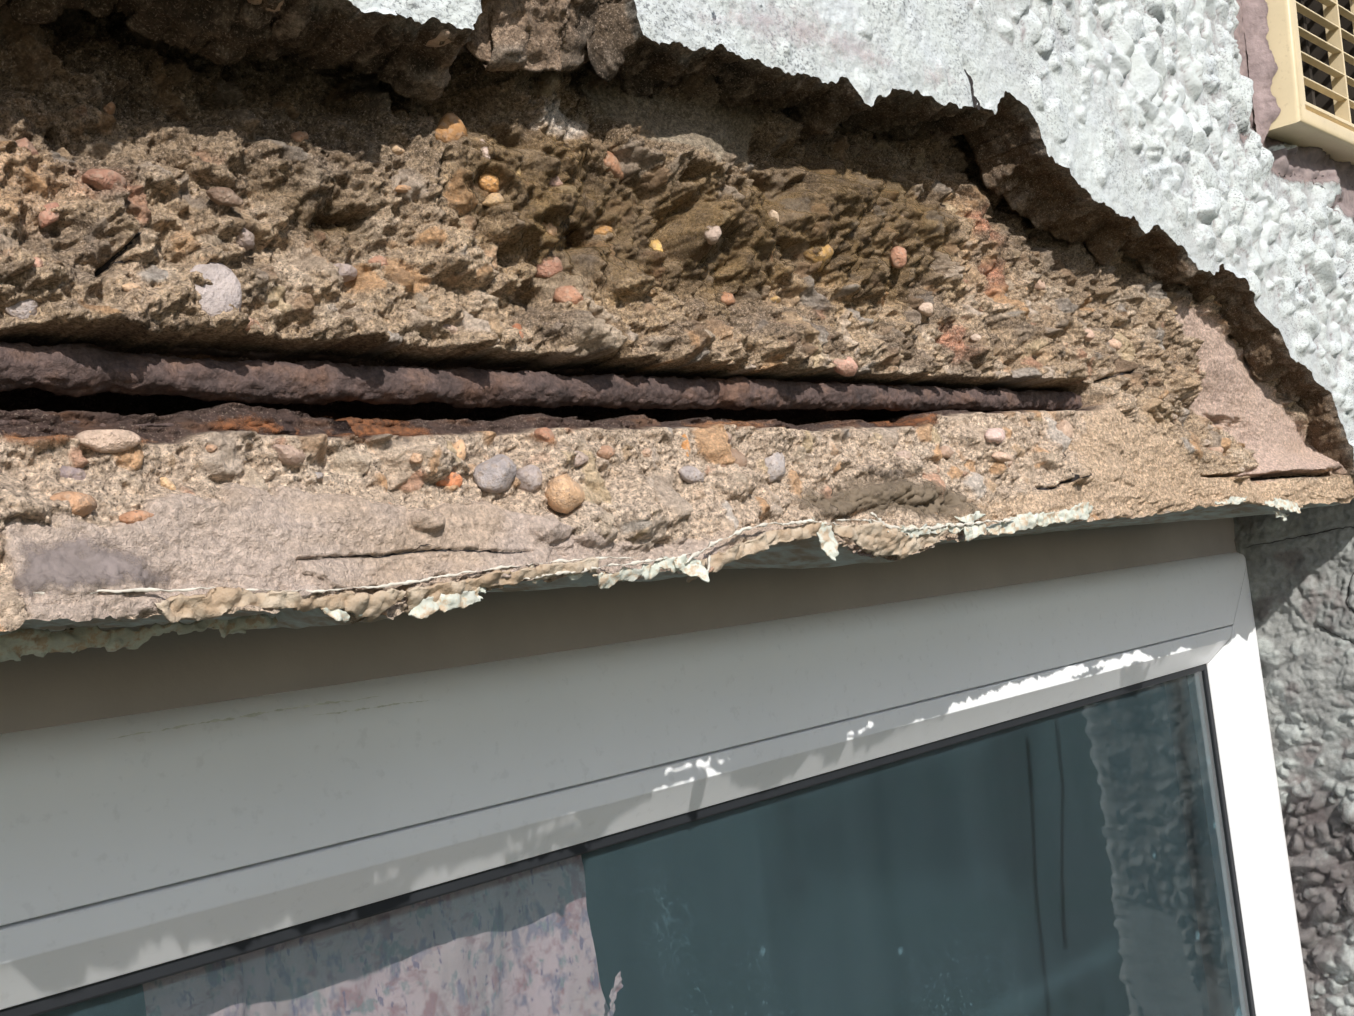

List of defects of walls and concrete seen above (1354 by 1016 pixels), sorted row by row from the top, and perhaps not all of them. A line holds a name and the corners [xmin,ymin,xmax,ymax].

spalling [0,0,1354,662]
corrosion [210,417,308,435]
corrosion [328,417,430,442]
corrosion [870,413,938,426]
crack [309,544,527,560]